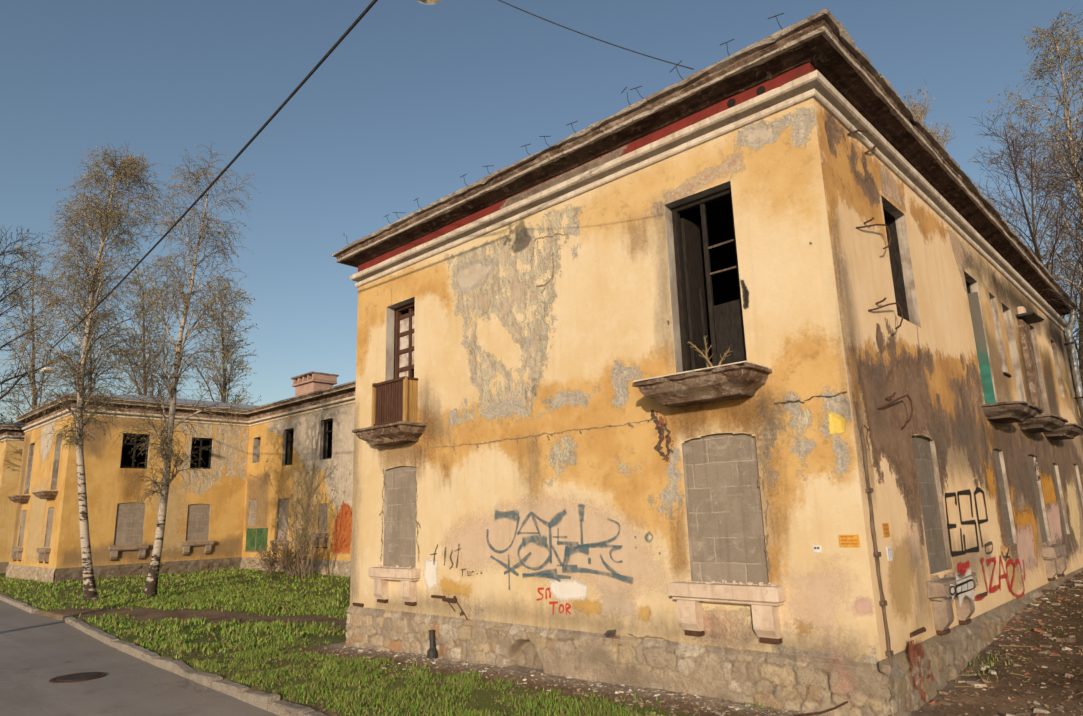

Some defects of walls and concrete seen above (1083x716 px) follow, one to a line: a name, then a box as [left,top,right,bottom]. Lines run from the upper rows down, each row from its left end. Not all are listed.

spalling [336,17,1074,308]
crack [378,470,386,562]
peeling [0,98,1083,603]
crack [415,409,671,562]
crack [774,391,847,405]
damp [856,318,1083,560]
flaking render [906,640,937,702]